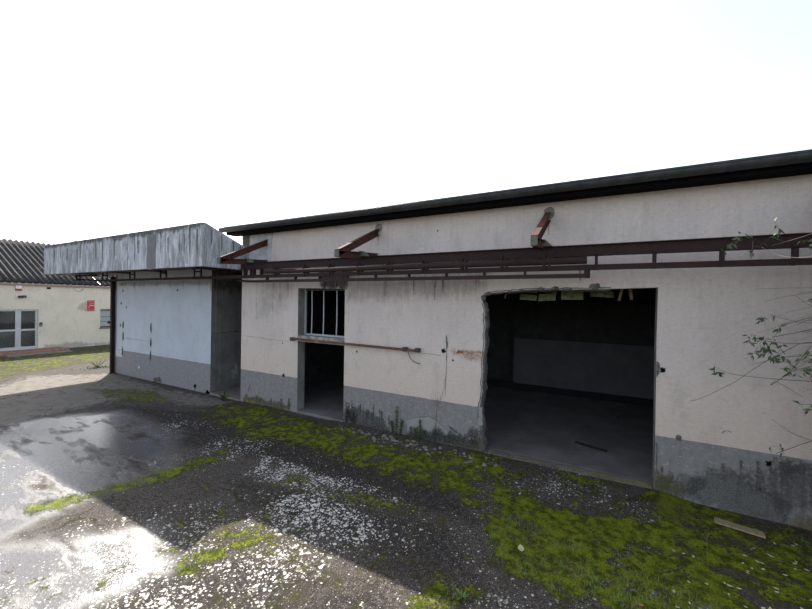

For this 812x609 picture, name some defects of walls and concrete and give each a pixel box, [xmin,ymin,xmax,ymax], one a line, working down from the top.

damp [46,223,199,261]